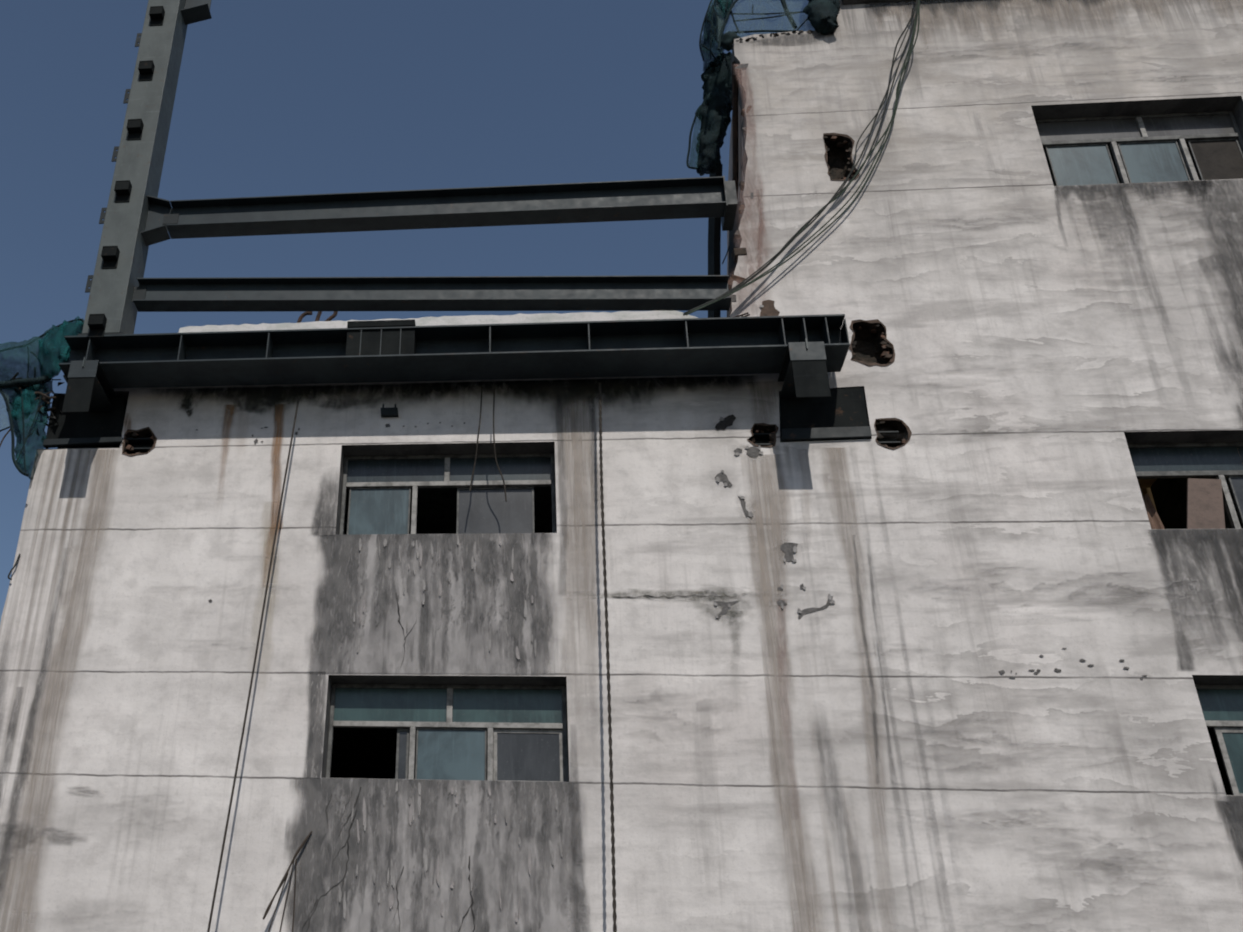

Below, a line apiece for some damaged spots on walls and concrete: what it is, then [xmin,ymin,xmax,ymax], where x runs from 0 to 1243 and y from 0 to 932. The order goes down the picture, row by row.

spalling [823,133,860,180]
water stain [1056,179,1243,344]
spalling [849,319,895,366]
spalling [122,427,157,456]
corrosion [270,404,284,542]
water stain [166,375,753,615]
spalling [734,423,779,458]
spalling [874,418,912,450]
water stain [9,449,114,816]
spalling [777,584,835,619]
water stain [1152,529,1243,605]
water stain [289,487,586,932]